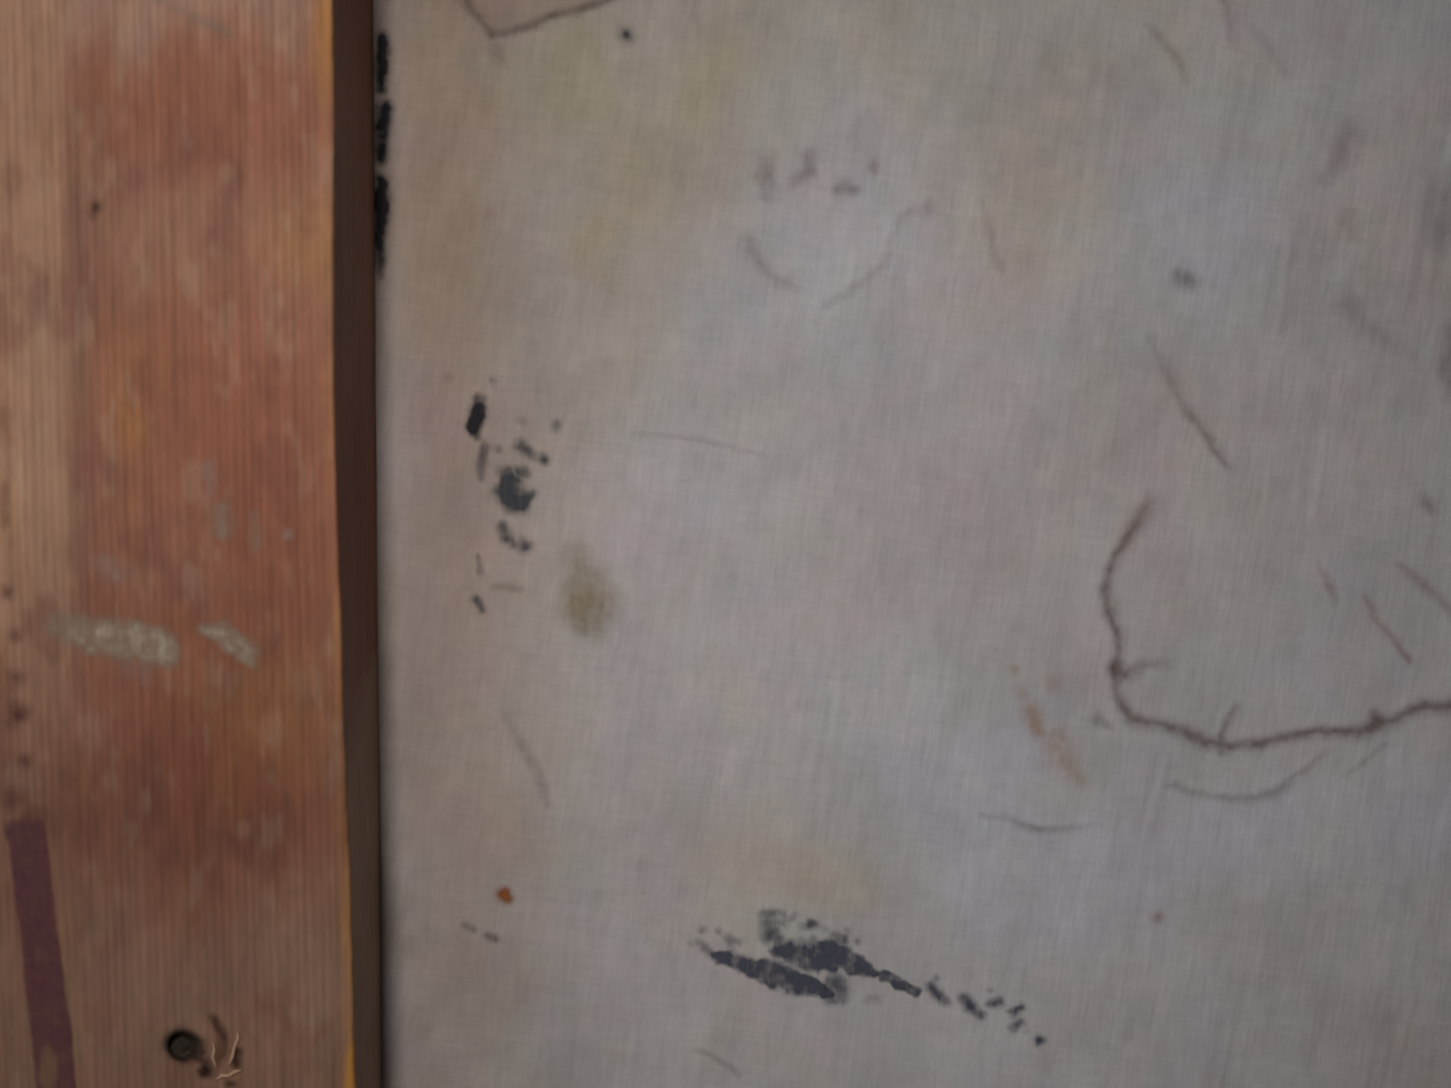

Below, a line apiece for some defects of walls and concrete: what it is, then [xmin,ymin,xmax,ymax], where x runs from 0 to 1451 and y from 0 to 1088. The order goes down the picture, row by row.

crack [1104,522,1451,749]